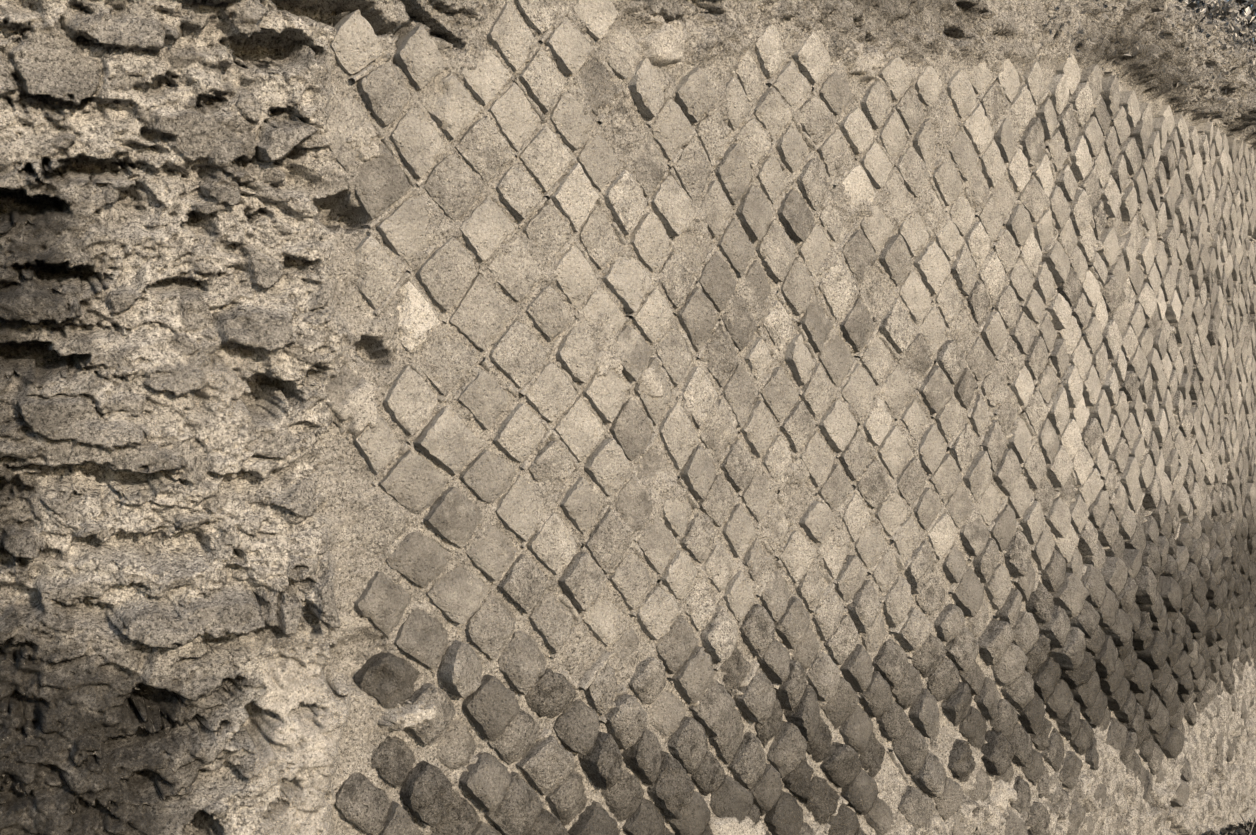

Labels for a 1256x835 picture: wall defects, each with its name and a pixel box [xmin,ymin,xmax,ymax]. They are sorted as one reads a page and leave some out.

spalling [609,101,634,154]
spalling [620,0,1256,145]
spalling [0,0,497,835]